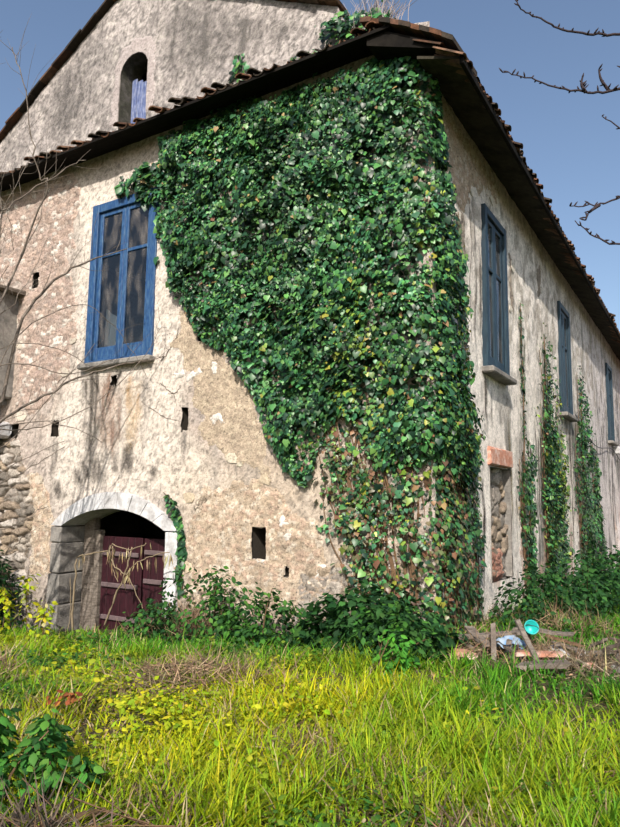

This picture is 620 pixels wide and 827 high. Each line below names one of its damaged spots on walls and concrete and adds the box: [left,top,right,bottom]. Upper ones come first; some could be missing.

damp [85,375,98,448]
flaking render [490,468,509,583]